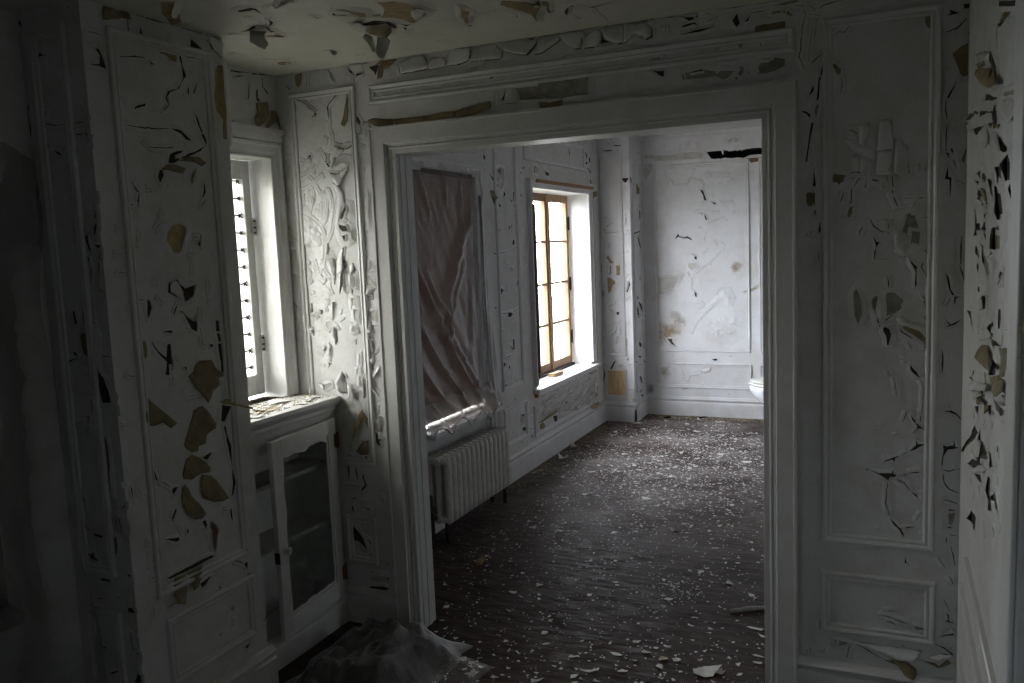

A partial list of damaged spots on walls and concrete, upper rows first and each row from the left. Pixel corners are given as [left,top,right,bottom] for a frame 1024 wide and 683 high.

peeling [124,0,794,605]
peeling [848,186,927,352]
peeling [864,435,924,539]
peeling [920,0,1016,544]